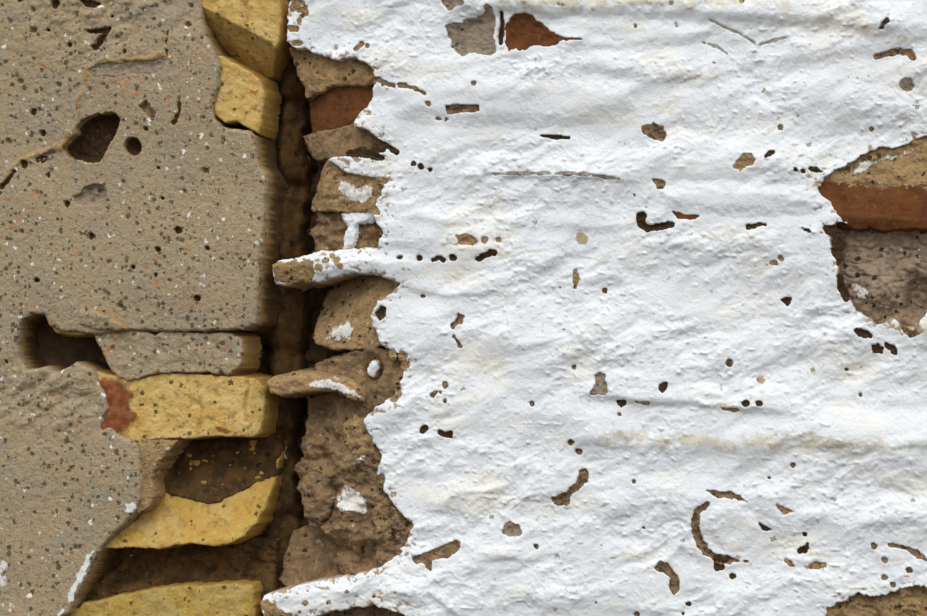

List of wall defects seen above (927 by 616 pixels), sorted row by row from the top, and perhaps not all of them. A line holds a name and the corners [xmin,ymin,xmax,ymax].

peeling [441,0,464,11]
peeling [445,2,582,56]
spalling [88,49,168,78]
spalling [202,0,431,286]
spalling [794,136,927,355]
peeling [450,313,465,348]
spalling [36,275,414,616]
peeling [420,425,453,438]
crack [691,490,749,571]
peeling [871,542,927,573]
spalling [825,574,927,616]